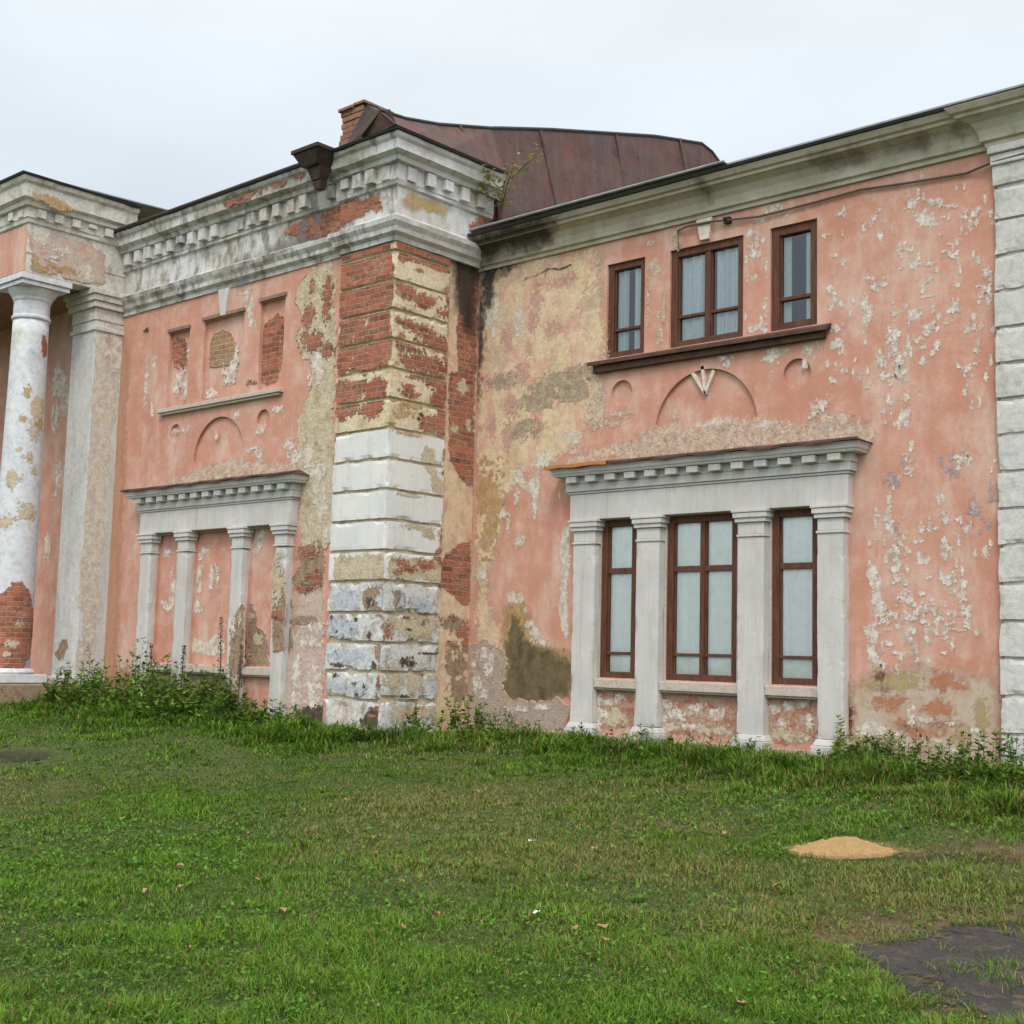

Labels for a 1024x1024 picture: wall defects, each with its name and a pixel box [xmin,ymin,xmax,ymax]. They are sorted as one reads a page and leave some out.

peeling [29,230,106,285]
damp [454,218,556,392]
peeling [142,350,158,423]
peeling [0,362,69,531]
peeling [165,168,999,731]
flaking render [0,581,34,669]
damp [503,593,571,703]
spalling [660,693,738,740]
spalling [768,698,818,746]
damp [848,662,1000,764]